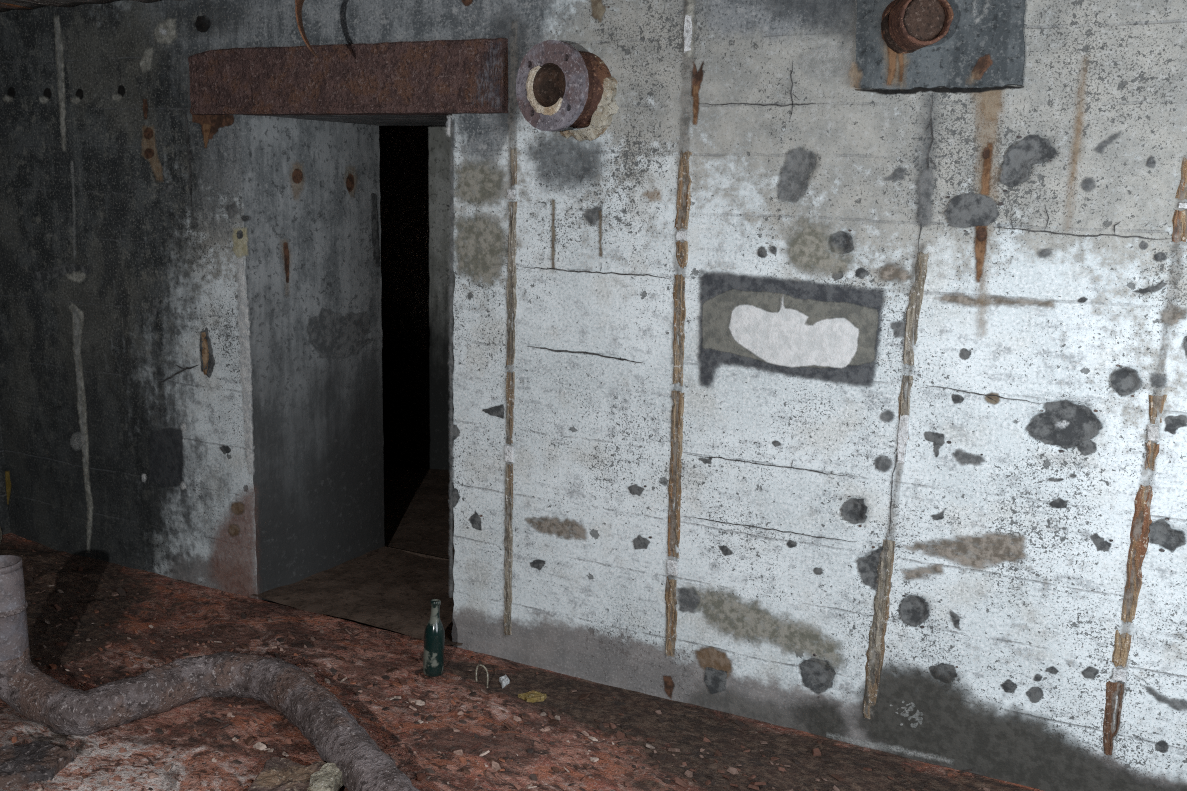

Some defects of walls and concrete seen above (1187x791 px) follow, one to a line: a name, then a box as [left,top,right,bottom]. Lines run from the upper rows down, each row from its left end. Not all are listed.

water stain [140,19,177,71]
corrosion [881,0,921,85]
water stain [54,16,76,254]
water stain [233,228,254,474]
water stain [69,304,93,552]
spalling [1028,400,1102,455]
corrosion [663,676,674,698]
water stain [691,665,1187,791]